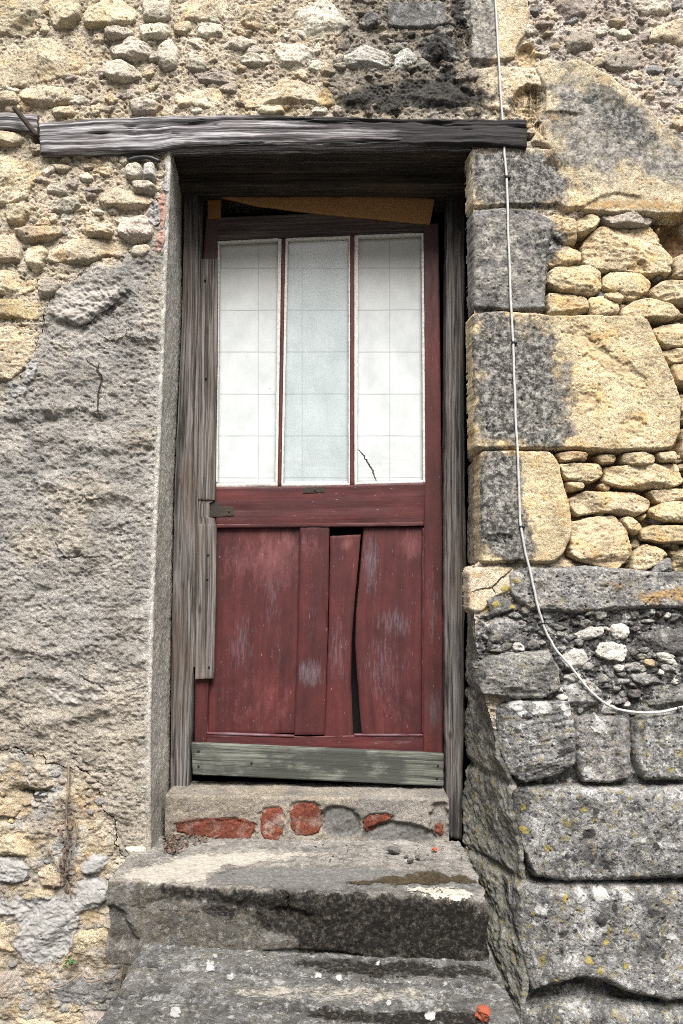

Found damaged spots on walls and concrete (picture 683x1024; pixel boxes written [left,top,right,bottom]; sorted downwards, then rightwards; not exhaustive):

crack [79,292,148,418]
crack [471,568,512,593]
peeling [0,853,109,968]